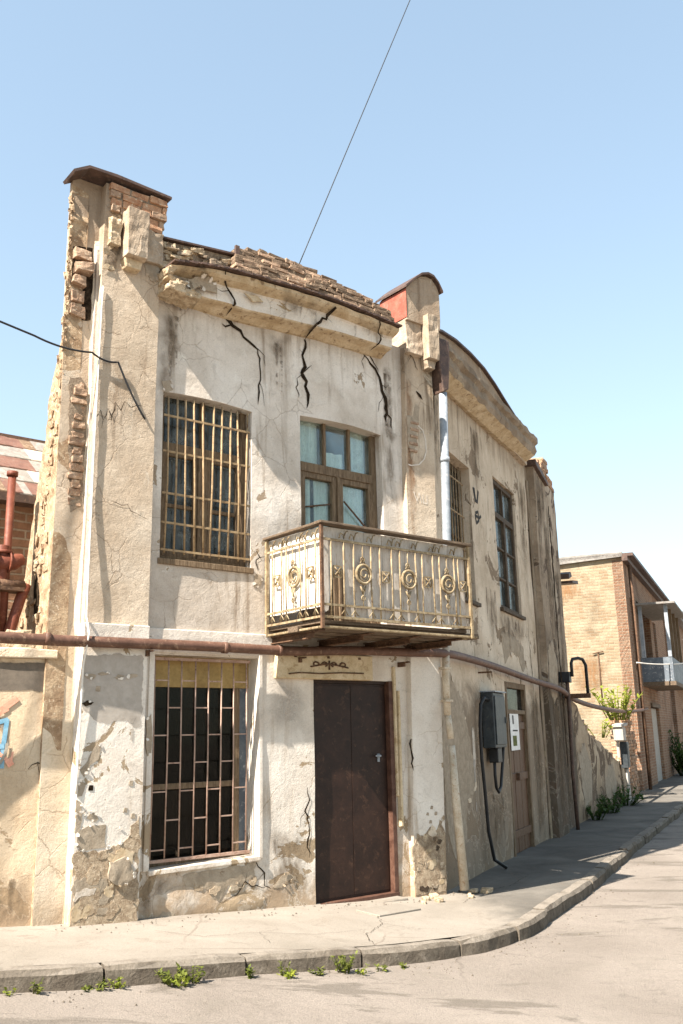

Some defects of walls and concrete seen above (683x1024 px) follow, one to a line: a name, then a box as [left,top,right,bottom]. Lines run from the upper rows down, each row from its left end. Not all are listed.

crack [218,270,265,406]
crack [296,306,337,407]
crack [362,319,392,428]
spalling [69,744,142,927]
spalling [183,862,257,901]
crack [221,862,271,904]
crack [302,788,310,858]
peeling [411,671,477,895]